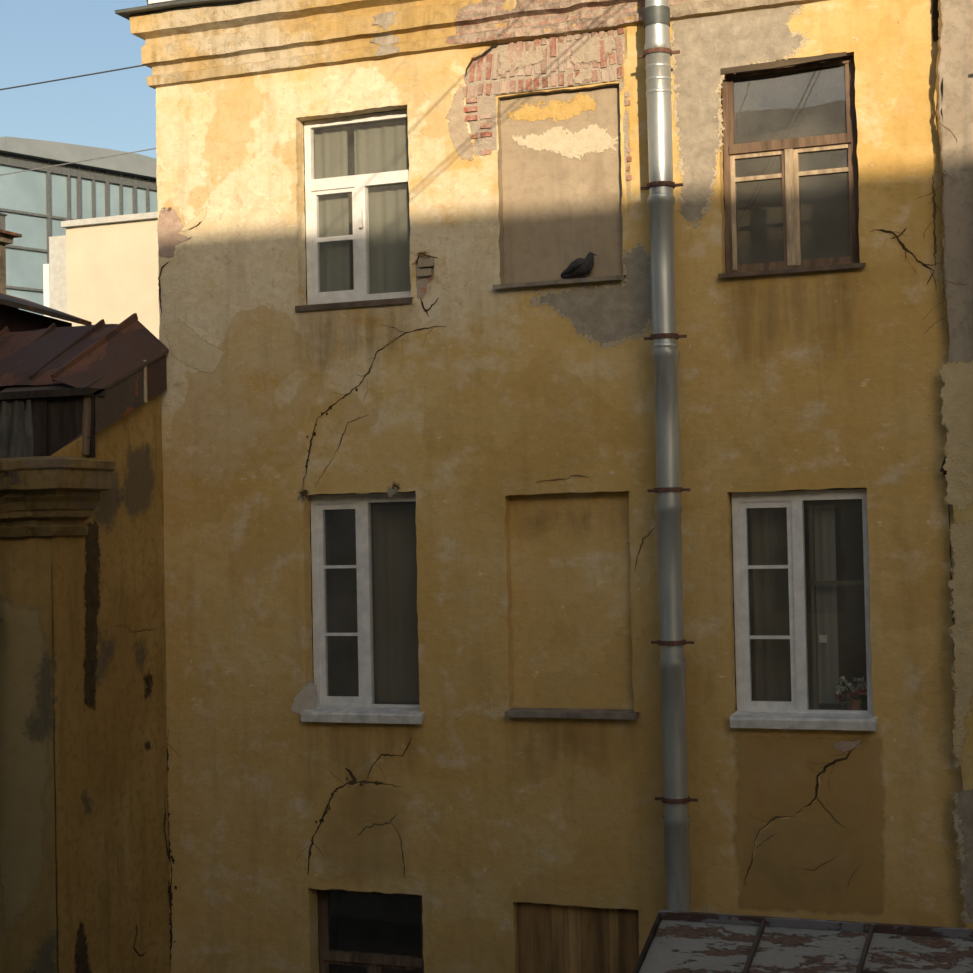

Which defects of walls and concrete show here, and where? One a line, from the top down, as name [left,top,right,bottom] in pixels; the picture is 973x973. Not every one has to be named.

flaking render [157,207,207,257]
spalling [446,0,645,197]
flaking render [530,242,652,349]
flaking render [668,0,810,228]
crack [870,0,969,332]
crack [301,324,447,497]
leakage [83,444,153,710]
crack [946,481,955,657]
peeling [939,360,973,767]
crack [295,737,412,878]
crack [745,743,860,885]
leakage [75,923,91,973]